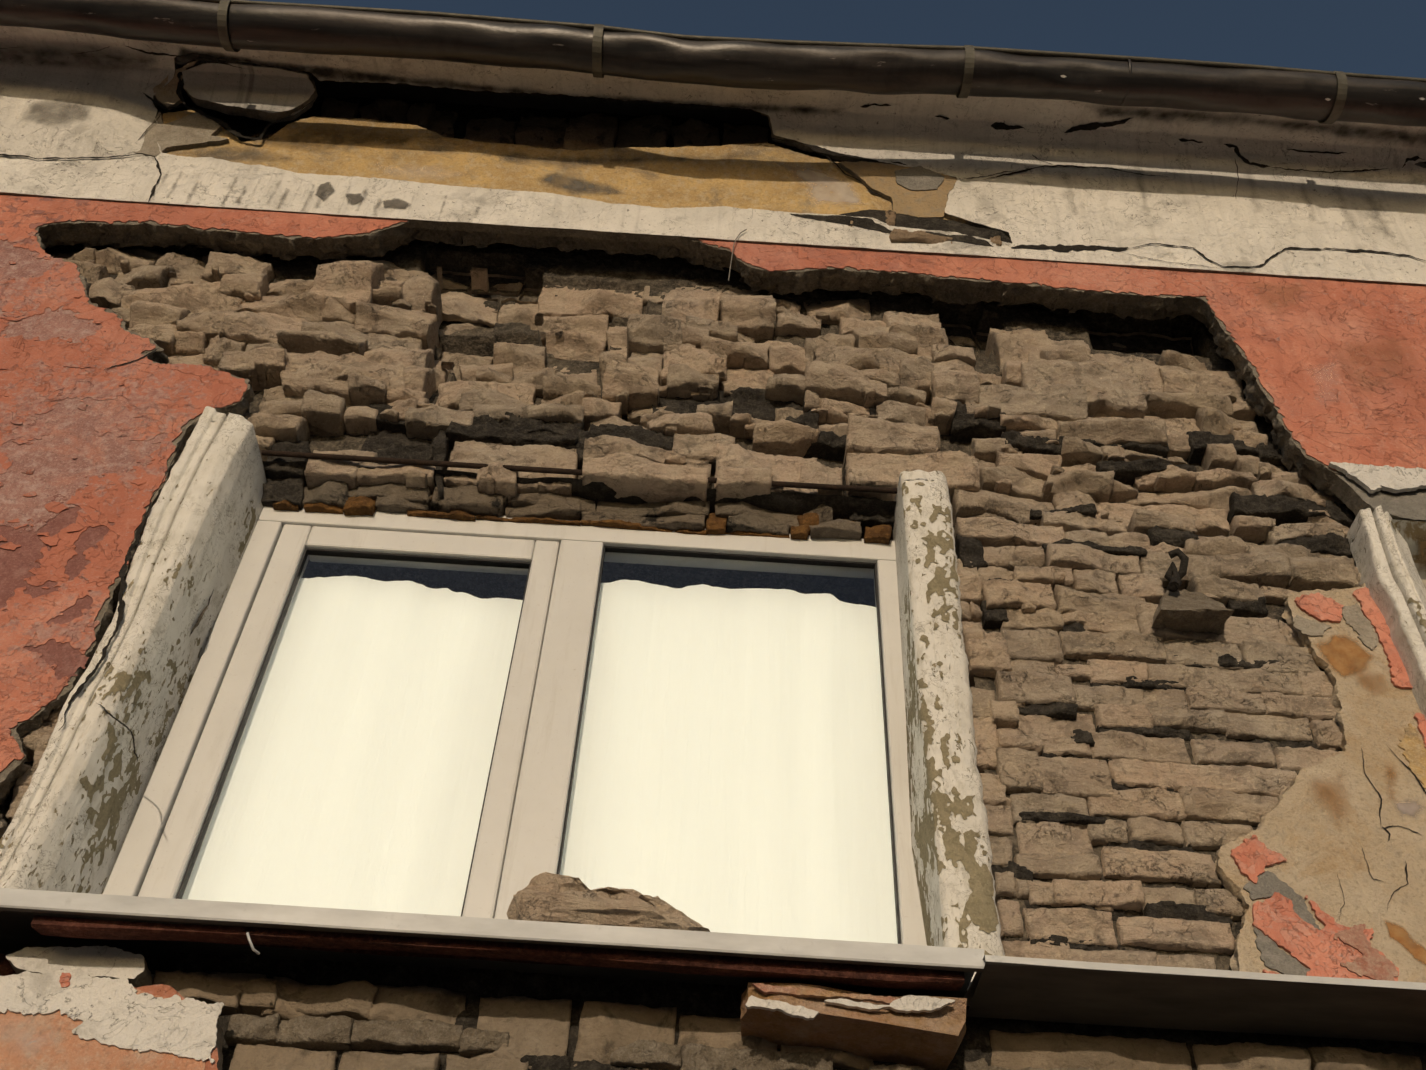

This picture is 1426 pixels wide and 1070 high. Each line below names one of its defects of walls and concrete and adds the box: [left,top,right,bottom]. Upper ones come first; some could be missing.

spalling [133,60,1018,247]
crack [1179,138,1426,197]
crack [1011,243,1426,268]
spalling [0,239,1426,981]
spalling [0,945,925,1070]
spalling [946,990,1426,1070]